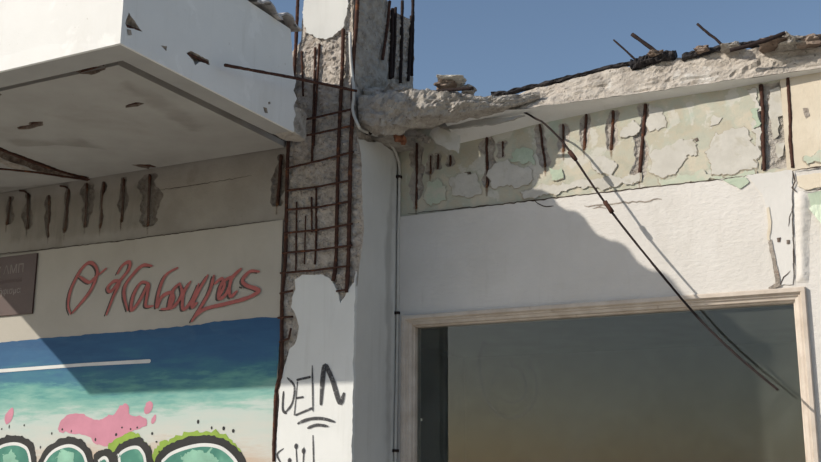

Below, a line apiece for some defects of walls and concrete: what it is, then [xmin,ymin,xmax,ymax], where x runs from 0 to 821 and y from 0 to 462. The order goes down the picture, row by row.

spalling [125,14,141,35]
spalling [187,51,210,65]
spalling [0,147,90,180]
corrosion [270,154,286,214]
spalling [272,0,415,462]
spalling [393,47,821,289]
corrosion [758,77,794,171]
crack [780,166,821,285]